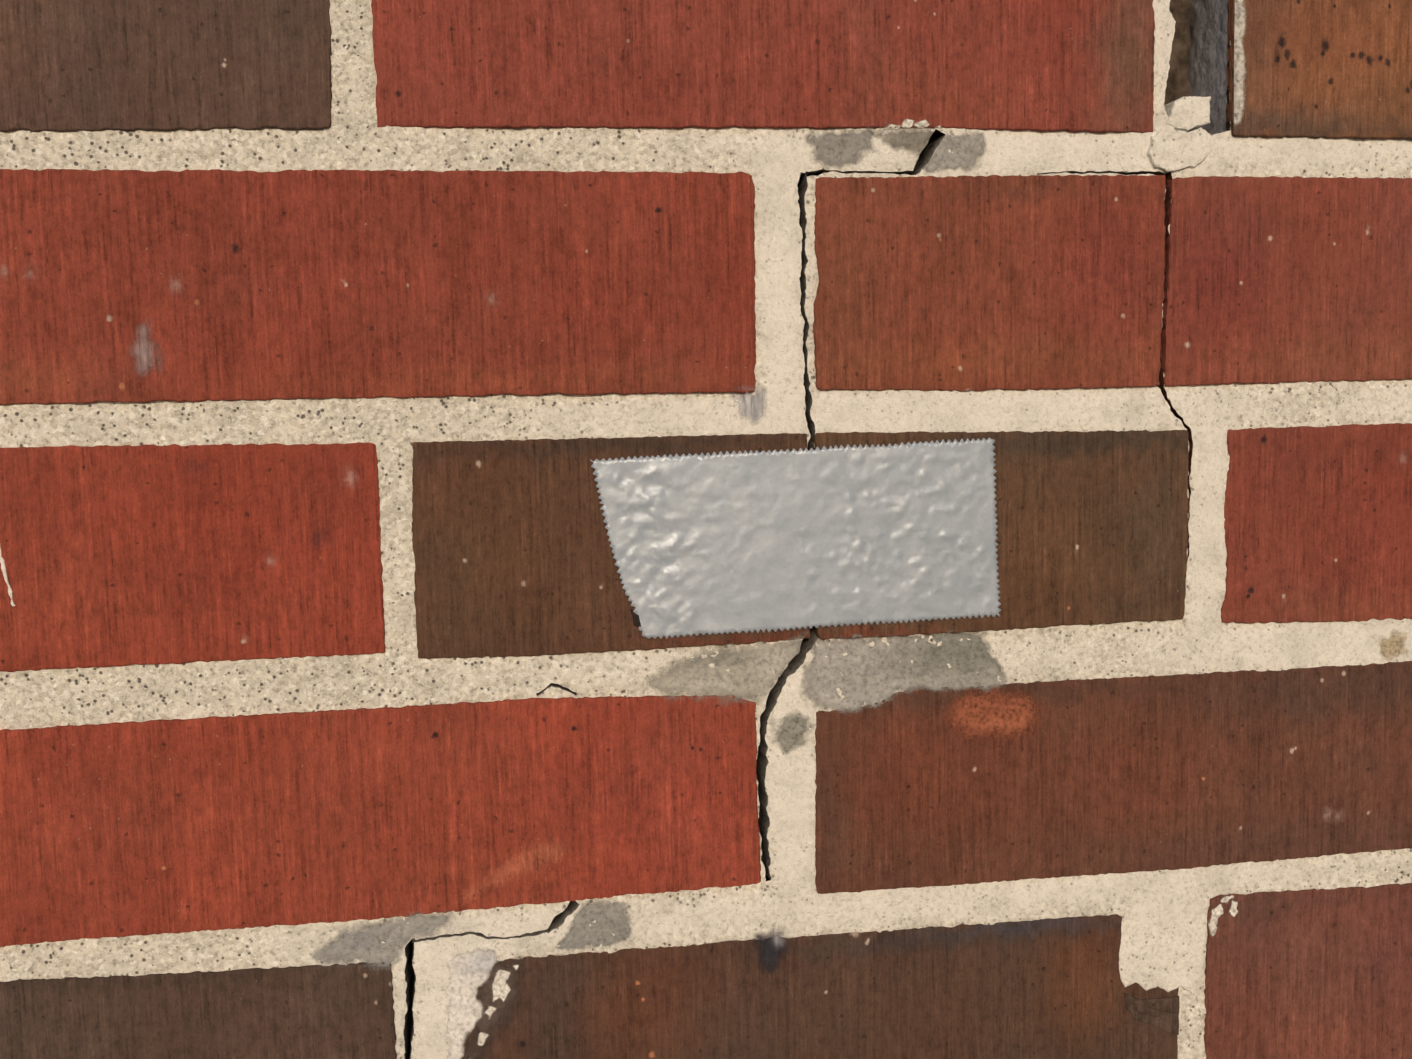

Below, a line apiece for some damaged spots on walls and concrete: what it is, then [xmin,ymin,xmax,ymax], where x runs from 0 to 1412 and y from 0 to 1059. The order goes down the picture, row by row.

crack [797,135,945,451]
crack [1037,170,1193,560]
crack [536,683,576,696]
crack [756,628,818,880]
crack [403,901,579,1059]
peeling [485,965,518,1016]